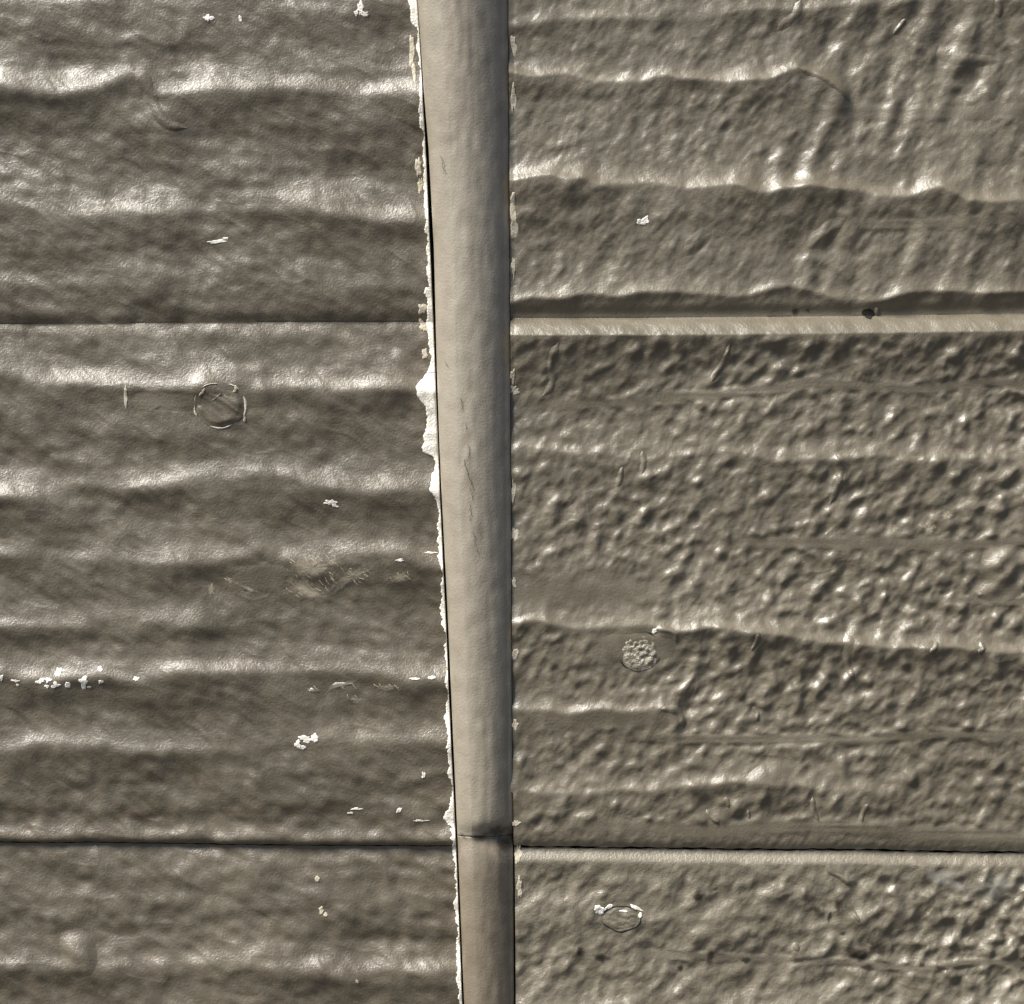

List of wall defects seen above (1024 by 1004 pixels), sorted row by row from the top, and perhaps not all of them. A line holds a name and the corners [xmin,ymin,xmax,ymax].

peeling [35,666,104,689]
peeling [294,733,318,750]
peeling [408,0,462,1004]
crack [423,97,478,1004]